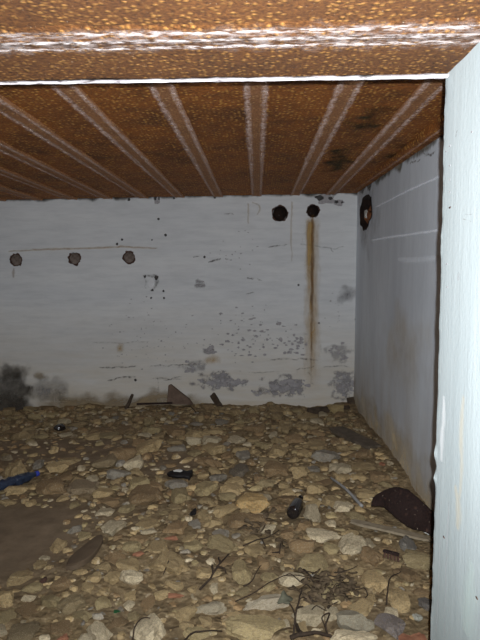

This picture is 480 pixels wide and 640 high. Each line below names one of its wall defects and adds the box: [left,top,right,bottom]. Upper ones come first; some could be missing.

leakage [0,368,50,411]
peeling [185,360,248,391]
peeling [251,374,311,396]